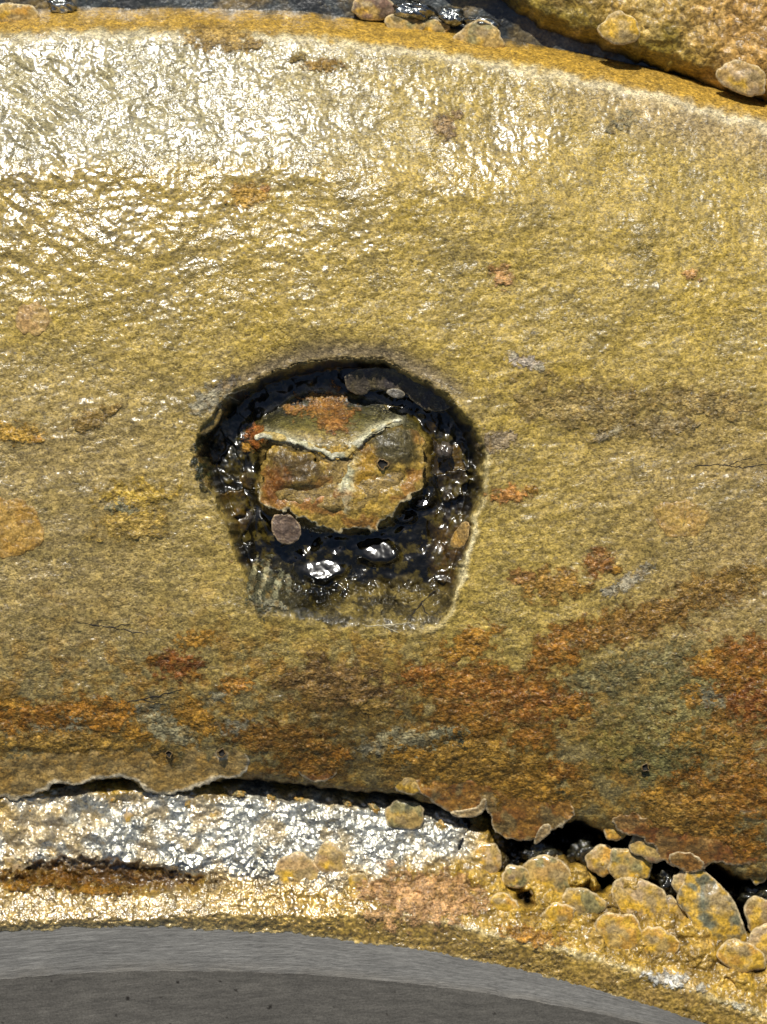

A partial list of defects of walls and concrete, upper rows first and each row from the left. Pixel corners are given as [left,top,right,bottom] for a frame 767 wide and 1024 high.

water stain [188,373,242,417]
peeling [344,367,450,412]
peeling [201,409,222,436]
rust [242,424,268,453]
rust [283,380,361,460]
peeling [258,424,427,545]
rust [484,482,538,504]
peeling [450,521,470,549]
water stain [240,554,292,621]
rust [506,545,623,607]
rust [0,559,767,1024]